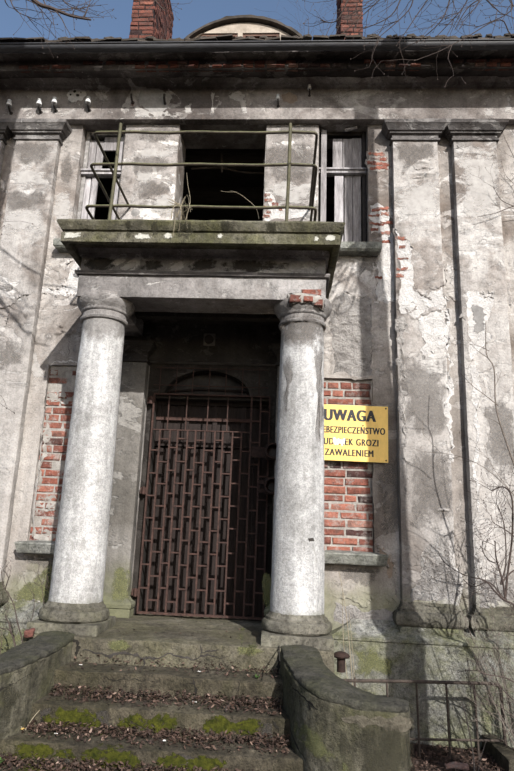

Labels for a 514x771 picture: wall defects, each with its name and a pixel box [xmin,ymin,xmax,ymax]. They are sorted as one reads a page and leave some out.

peeling [67,88,87,103]
flaking render [137,88,174,118]
flaking render [365,148,392,174]
crack [0,259,75,329]
flaking render [286,203,496,513]
crack [73,639,228,682]